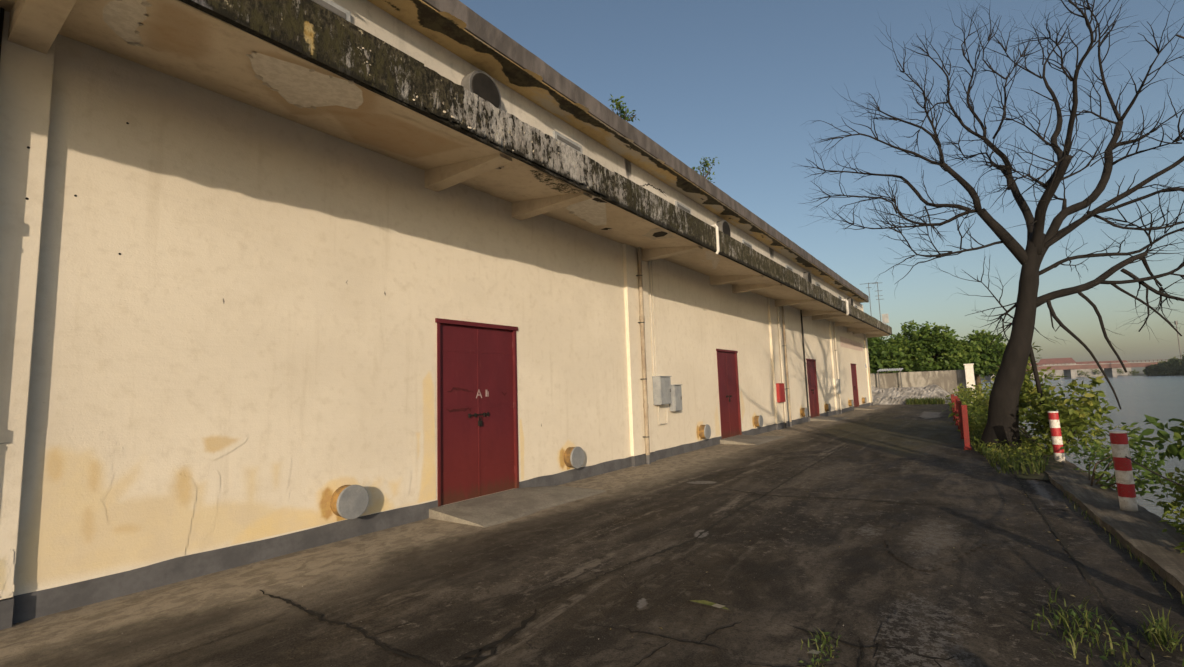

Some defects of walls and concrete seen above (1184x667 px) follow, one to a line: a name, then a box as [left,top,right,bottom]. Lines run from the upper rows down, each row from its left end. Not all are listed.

peeling [242,43,376,110]
peeling [409,81,627,230]
water stain [377,0,868,303]
spalling [641,227,680,240]
water stain [0,426,313,597]
water stain [351,364,436,514]
crack [439,608,537,667]